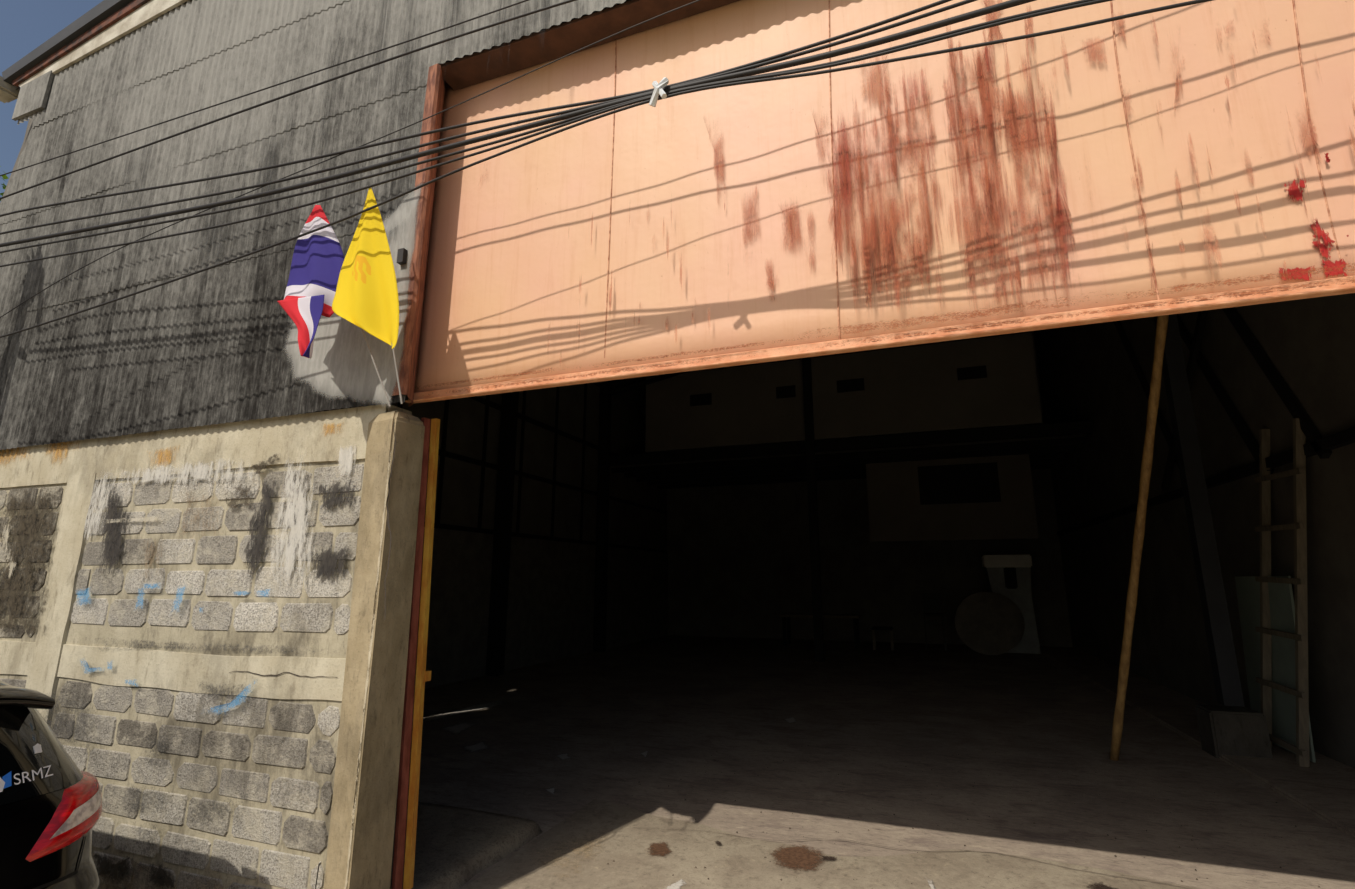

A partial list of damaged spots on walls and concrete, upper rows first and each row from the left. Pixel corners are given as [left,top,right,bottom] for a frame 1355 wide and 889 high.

corrosion [714,144,724,178]
corrosion [817,0,1355,347]
peeling [1284,179,1307,201]
corrosion [787,207,812,247]
peeling [1279,219,1349,281]
corrosion [419,323,787,393]
damp [84,446,356,586]
damp [0,490,58,634]
damp [95,854,234,889]